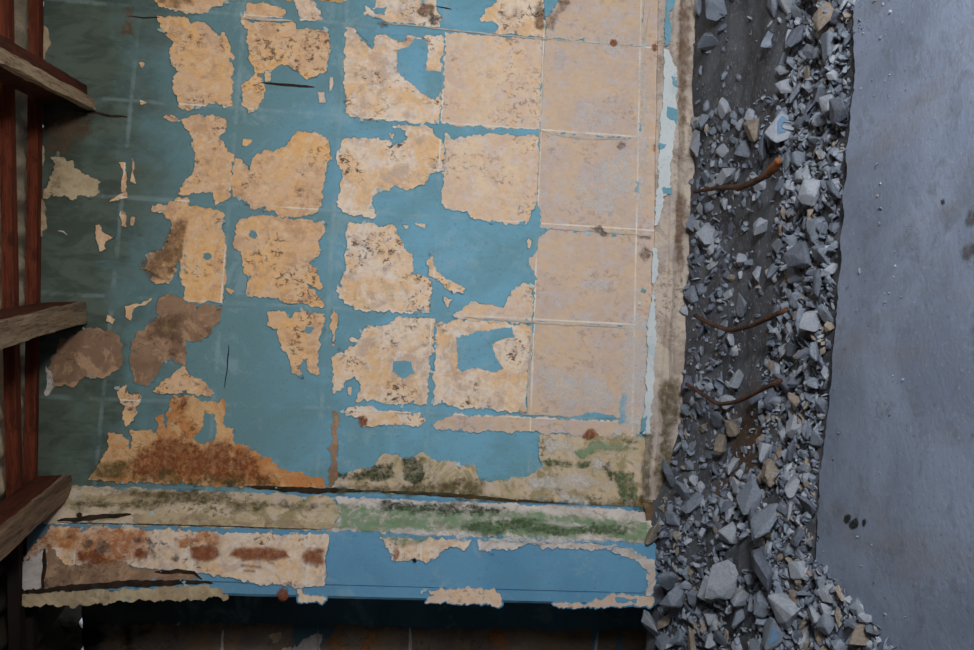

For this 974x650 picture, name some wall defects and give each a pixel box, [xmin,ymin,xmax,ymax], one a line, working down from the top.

crack [261,81,314,89]
peeling [22,0,660,610]
rust [131,439,269,485]
water stain [336,382,680,544]
crack [57,512,307,529]
rust [176,532,219,561]
rust [232,548,286,571]
rust [303,549,323,564]
peeling [92,621,647,650]